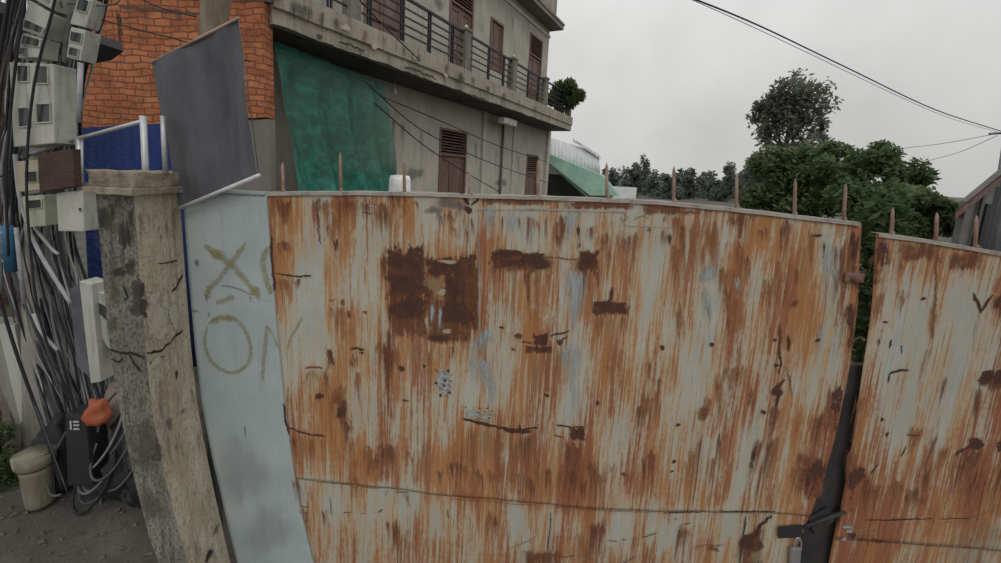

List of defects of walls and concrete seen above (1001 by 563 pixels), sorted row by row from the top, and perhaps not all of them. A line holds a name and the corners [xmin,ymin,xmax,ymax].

corrosion [482,198,630,245]
crack [116,267,129,301]
crack [107,330,183,373]
corrosion [305,243,479,445]
corrosion [491,224,638,306]
corrosion [592,287,629,333]
corrosion [643,202,755,329]
corrosion [761,220,860,347]
corrosion [869,242,982,375]
corrosion [974,369,1001,423]
corrosion [438,424,656,501]
corrosion [738,515,772,563]